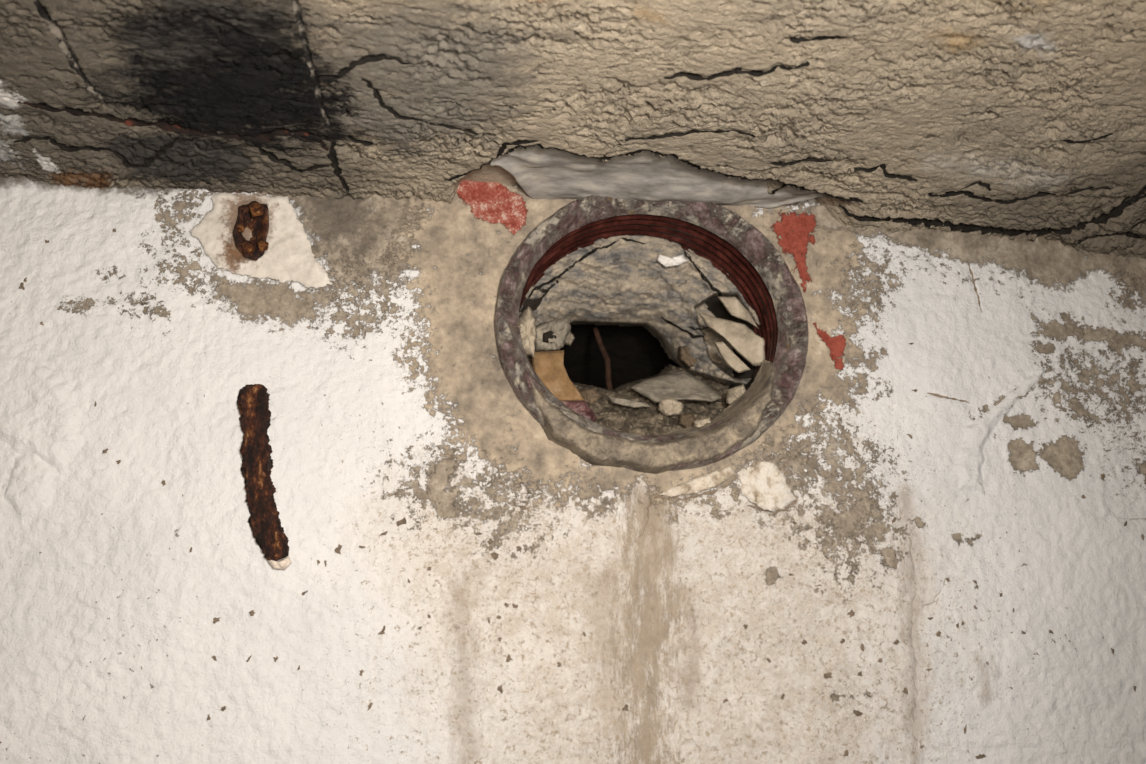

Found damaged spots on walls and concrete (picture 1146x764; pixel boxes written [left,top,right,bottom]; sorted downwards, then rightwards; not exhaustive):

crack [664,36,847,81]
crack [13,101,374,192]
leakage [0,0,528,253]
crack [317,54,1146,246]
corrosion [227,192,269,271]
peeling [55,180,1146,618]
corrosion [247,439,270,474]
leakage [331,460,1012,764]
peeling [822,672,872,716]